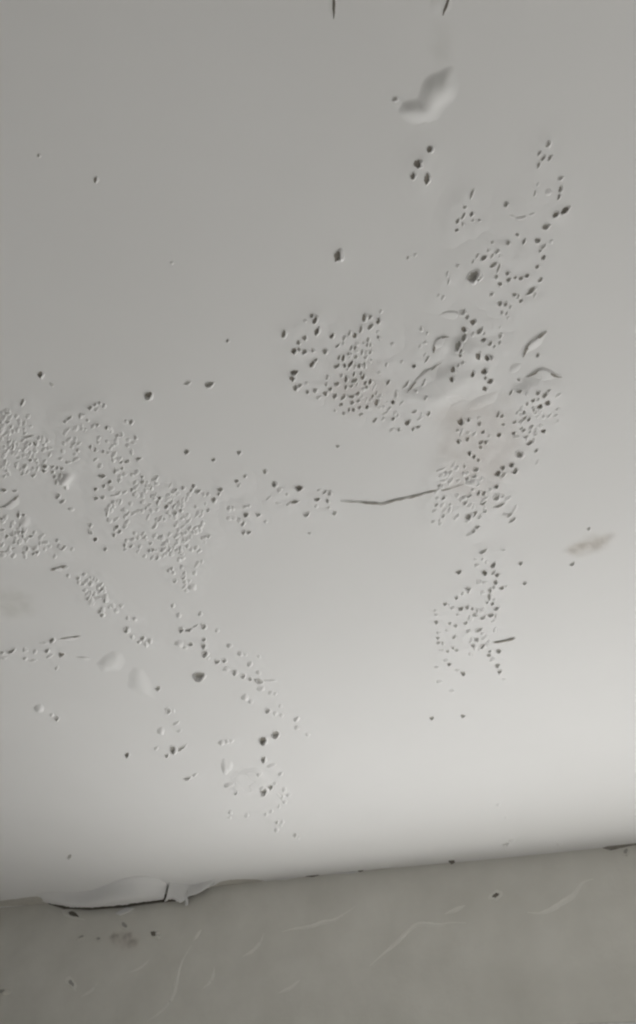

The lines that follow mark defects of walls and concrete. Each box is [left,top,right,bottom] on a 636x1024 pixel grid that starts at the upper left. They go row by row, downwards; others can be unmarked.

crack [341,484,463,505]
peeling [0,876,264,921]